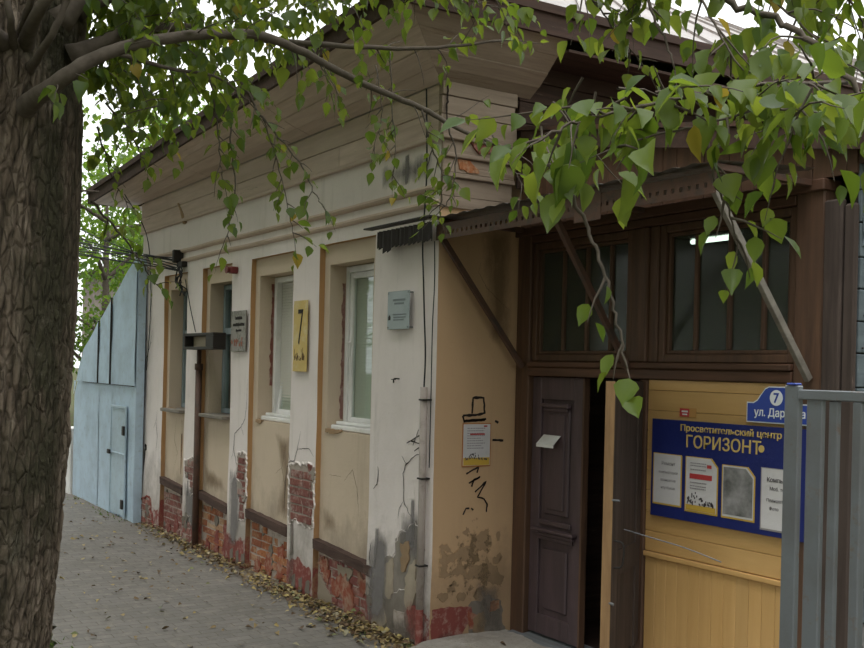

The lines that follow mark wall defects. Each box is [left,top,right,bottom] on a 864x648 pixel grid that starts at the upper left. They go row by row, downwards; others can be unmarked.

flaking render [141,450,425,645]
flaking render [430,527,505,640]